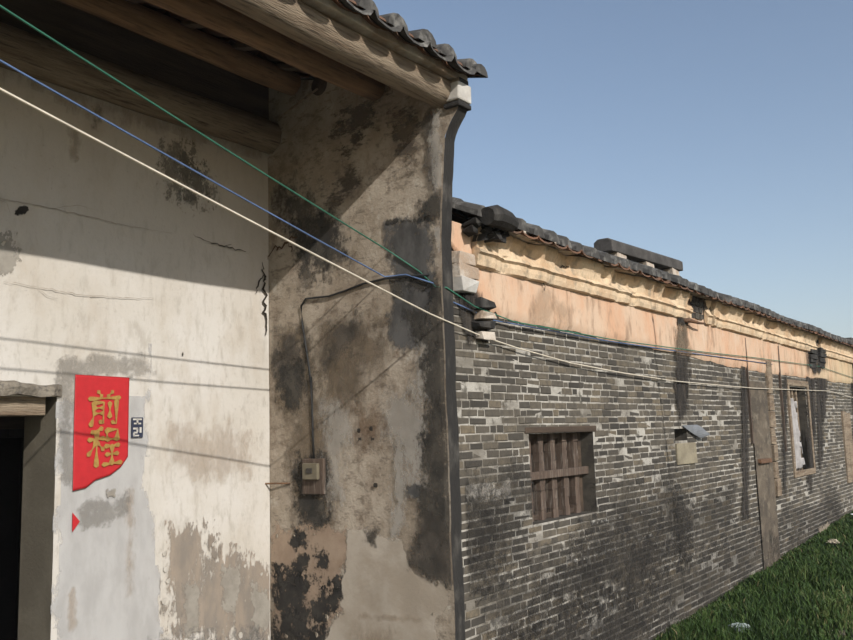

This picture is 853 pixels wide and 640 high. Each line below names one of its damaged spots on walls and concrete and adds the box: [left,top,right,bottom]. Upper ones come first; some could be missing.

damp [156,138,217,212]
damp [271,97,442,289]
peeling [0,230,23,276]
crack [194,235,297,335]
damp [384,278,452,590]
peeling [159,518,347,640]
damp [270,609,326,640]
damp [367,528,380,547]